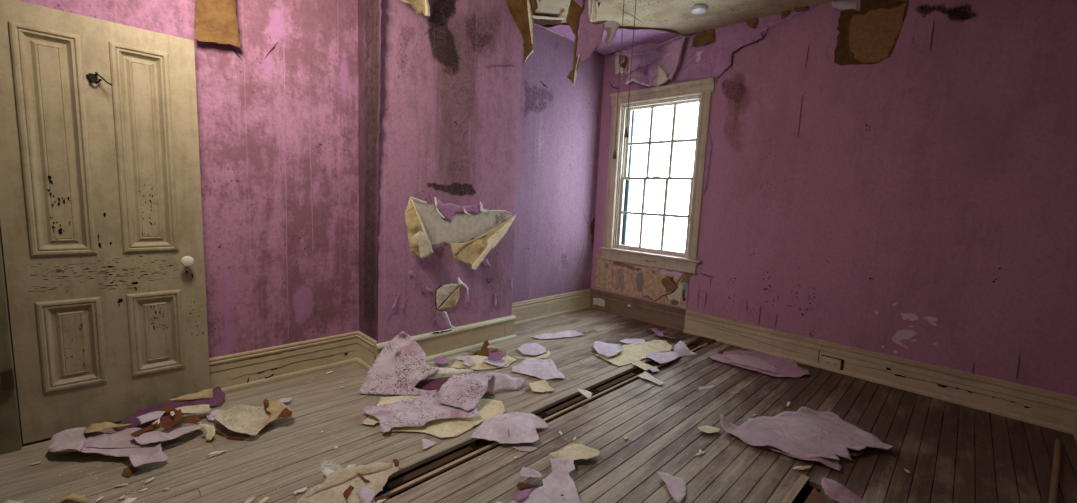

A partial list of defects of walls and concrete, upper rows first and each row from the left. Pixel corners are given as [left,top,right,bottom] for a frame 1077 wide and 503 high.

flaking render [532,15,565,25]
crack [716,27,769,82]
water stain [339,0,519,326]
flaking render [590,216,697,308]